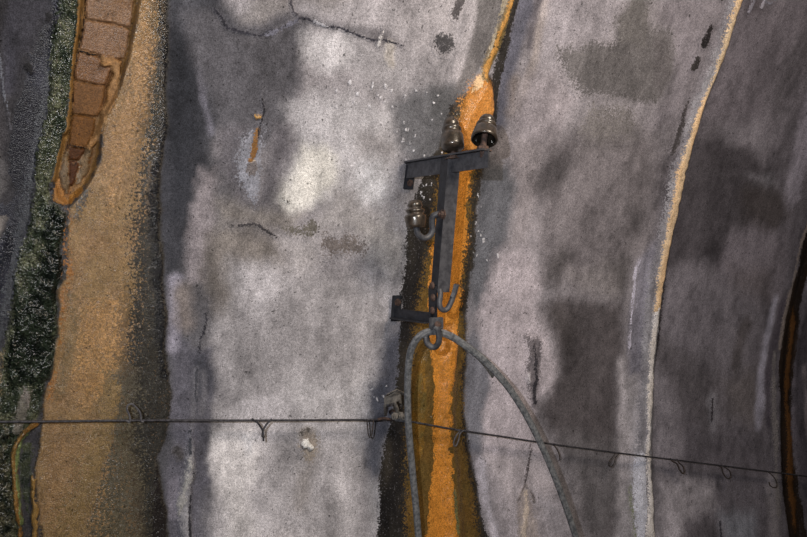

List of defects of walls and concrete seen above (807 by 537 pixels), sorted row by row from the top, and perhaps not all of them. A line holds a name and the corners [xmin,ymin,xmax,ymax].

damp [10,419,40,537]
damp [0,0,55,348]
spalling [51,0,139,207]
rust [24,0,175,537]
crack [211,0,405,48]
rust [373,168,493,537]
damp [469,221,500,262]
damp [551,0,777,537]